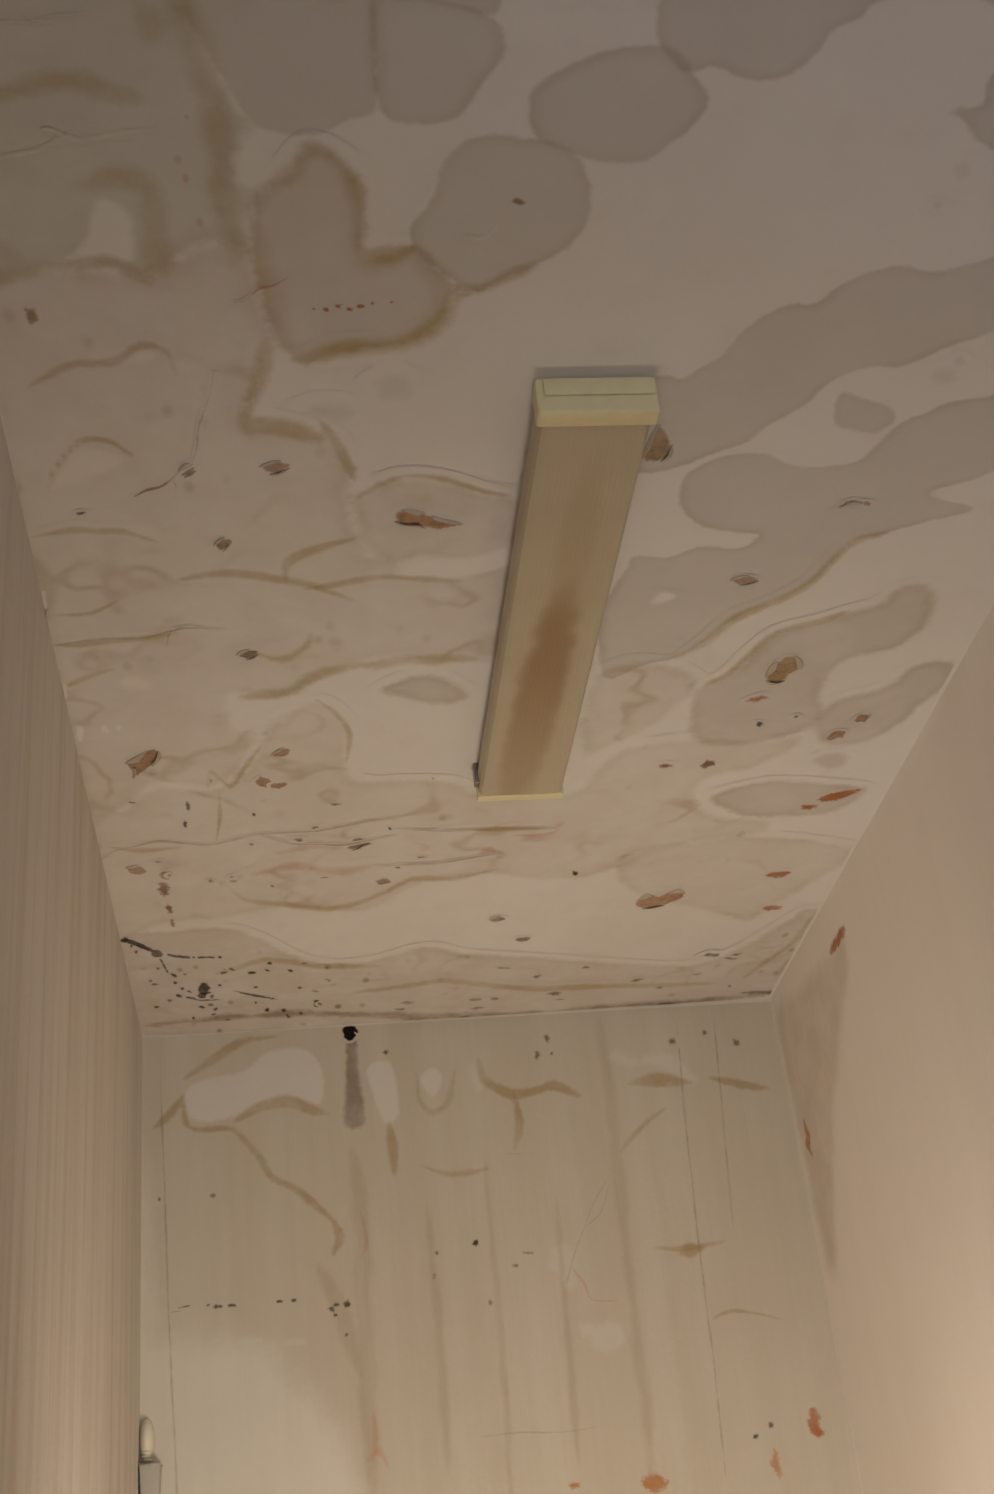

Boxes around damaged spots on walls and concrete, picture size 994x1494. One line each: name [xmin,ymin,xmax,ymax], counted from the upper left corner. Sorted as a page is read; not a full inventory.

damp [936,64,994,158]
damp [0,0,932,798]
damp [86,252,994,1494]
rust [828,919,848,963]
rust [802,1401,832,1444]
rust [633,1464,677,1494]